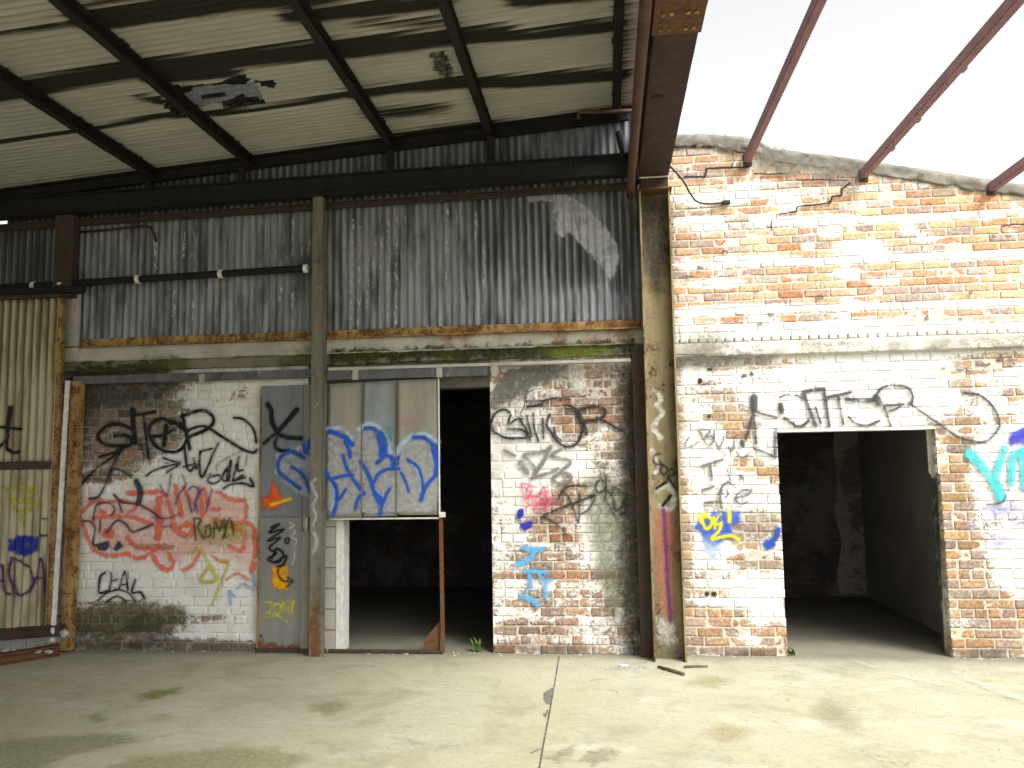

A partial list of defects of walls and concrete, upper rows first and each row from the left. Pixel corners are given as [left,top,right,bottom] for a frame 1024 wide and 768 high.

peeling [184,80,264,108]
crack [674,145,851,231]
corrosion [256,386,324,657]